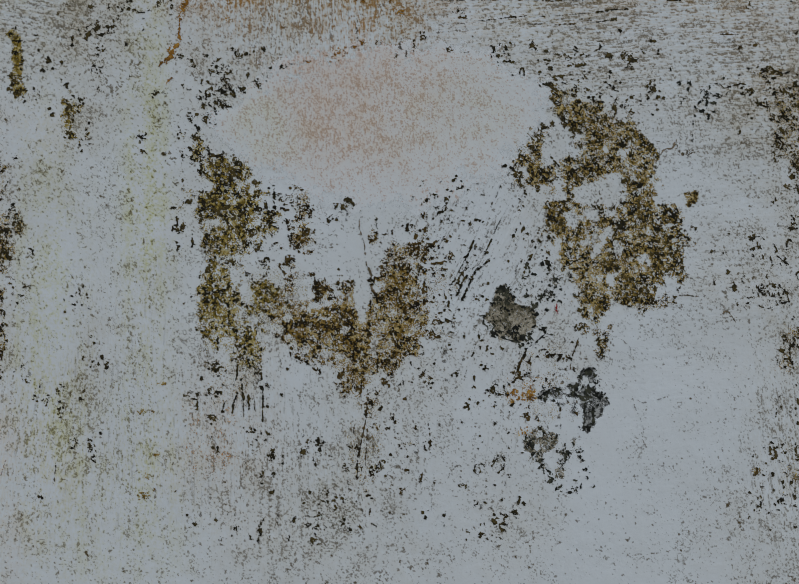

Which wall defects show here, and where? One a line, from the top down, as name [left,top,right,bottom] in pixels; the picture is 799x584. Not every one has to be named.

mould [5,26,40,104]
water stain [70,0,173,93]
corrosion [159,0,190,67]
water stain [677,65,799,194]
water stain [0,155,36,379]
water stain [170,46,501,547]
spalling [479,283,553,349]
water stain [445,39,699,427]
water stain [726,215,799,310]
water stain [775,316,799,373]
spalling [523,367,610,494]
water stain [466,496,526,547]